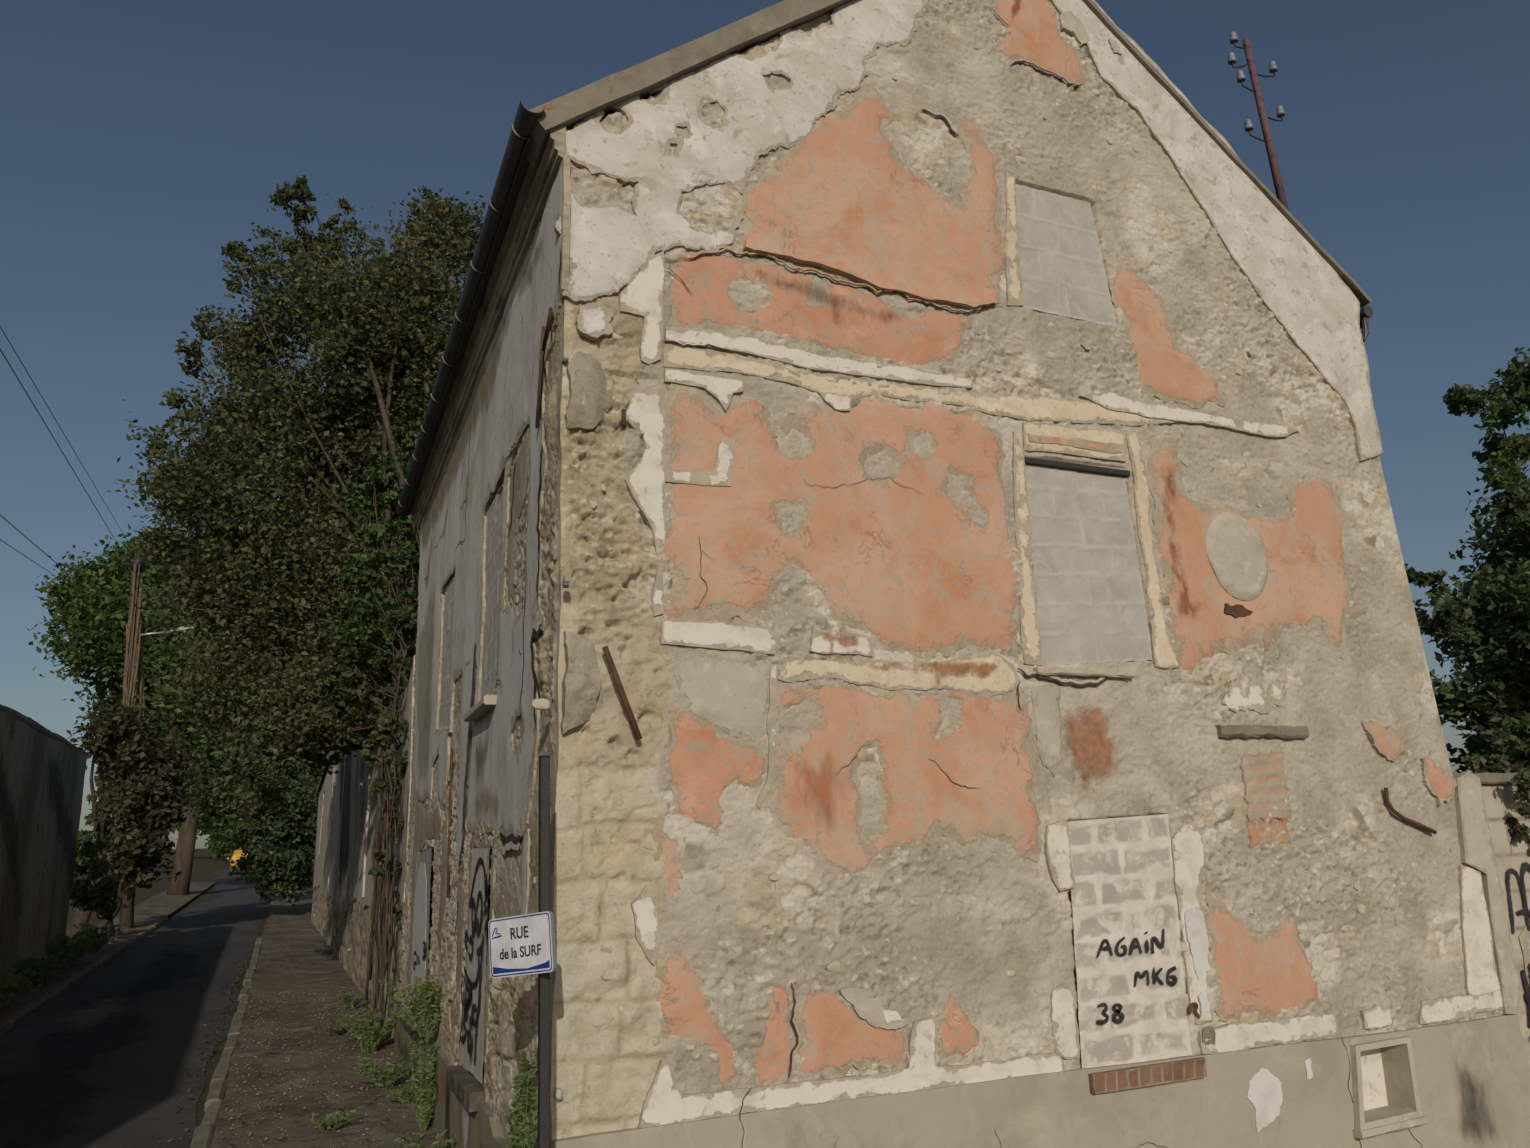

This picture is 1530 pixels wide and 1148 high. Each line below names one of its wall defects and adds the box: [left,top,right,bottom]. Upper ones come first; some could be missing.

spalling [853,0,1116,202]
crack [424,251,561,726]
leakage [339,751,351,888]
spalling [311,674,472,1066]
corrosion [461,644,476,851]
spalling [484,287,1082,1140]
spalling [961,304,1486,1036]
crack [739,1087,752,1148]
crack [787,982,801,1081]